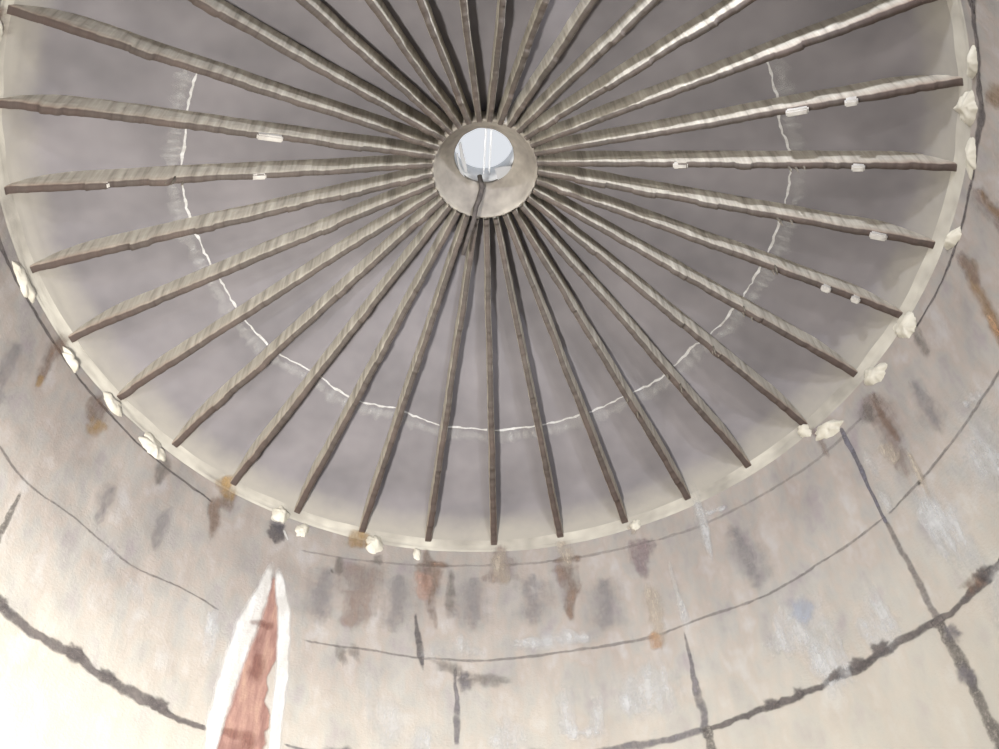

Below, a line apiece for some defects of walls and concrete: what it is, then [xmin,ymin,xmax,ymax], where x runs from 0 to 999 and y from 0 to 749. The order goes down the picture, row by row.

crack [180,62,792,431]
corrosion [960,259,999,336]
crack [855,372,999,540]
crack [0,595,206,730]
crack [456,556,830,673]
crack [604,559,999,749]